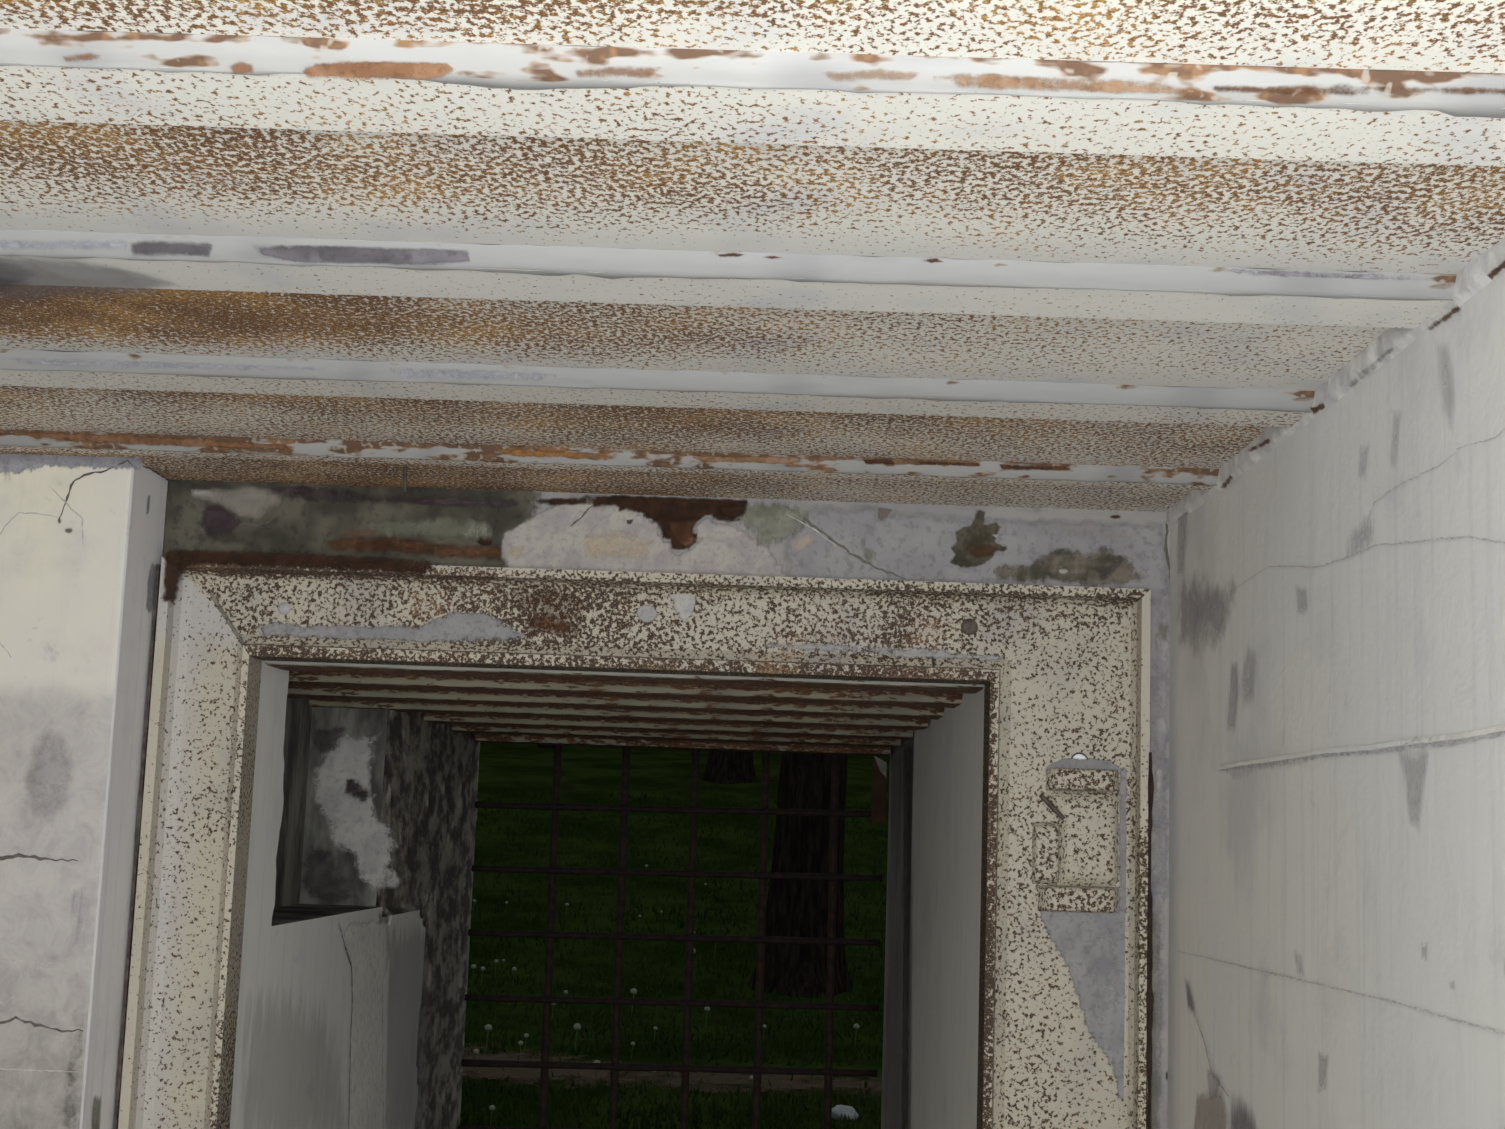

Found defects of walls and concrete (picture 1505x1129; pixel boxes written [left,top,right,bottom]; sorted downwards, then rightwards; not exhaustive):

corrosion [304,62,453,80]
corrosion [577,68,654,77]
corrosion [954,74,1355,94]
crack [0,459,170,546]
corrosion [539,495,747,549]
spalling [502,501,1169,601]
peeling [261,612,523,642]
crack [1219,725,1505,771]
peeling [304,727,399,900]
crack [0,853,78,861]
peeling [1041,758,1127,1099]
crack [0,995,83,1033]